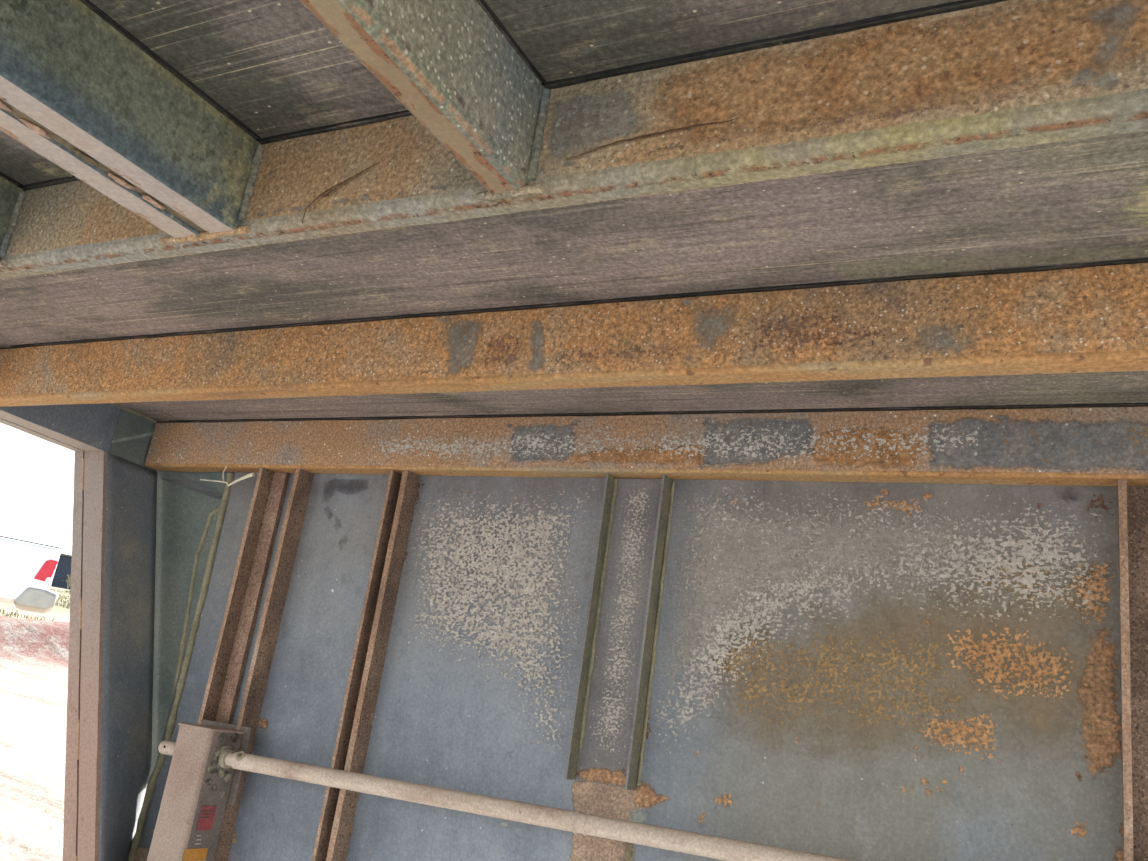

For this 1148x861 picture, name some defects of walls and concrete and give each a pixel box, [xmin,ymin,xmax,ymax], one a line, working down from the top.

corrosion [655,0,1148,144]
water stain [324,481,363,496]
corrosion [571,444,700,464]
corrosion [812,428,920,467]
water stain [404,484,599,751]
water stain [650,486,1112,754]
corrosion [717,556,1122,795]